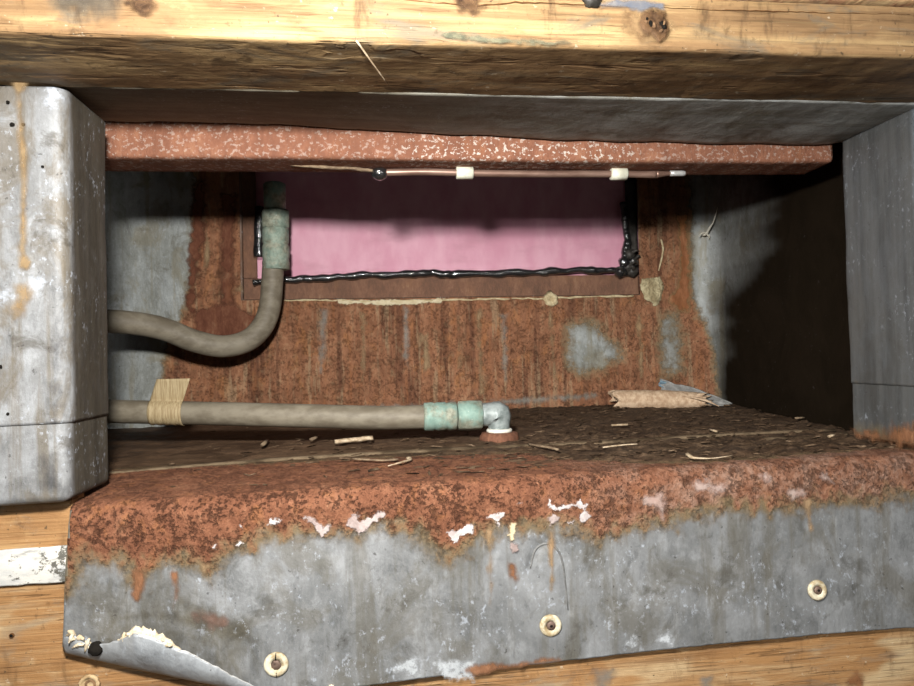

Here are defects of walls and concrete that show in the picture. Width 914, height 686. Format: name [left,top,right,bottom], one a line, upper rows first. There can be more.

corrosion [9,122,30,269]
corrosion [13,286,30,313]
corrosion [161,172,720,409]
peeling [303,516,330,538]
peeling [346,511,385,535]
peeling [447,524,474,543]
corrosion [65,422,914,601]
peeling [488,512,519,553]
peeling [548,499,591,526]
peeling [644,494,662,509]